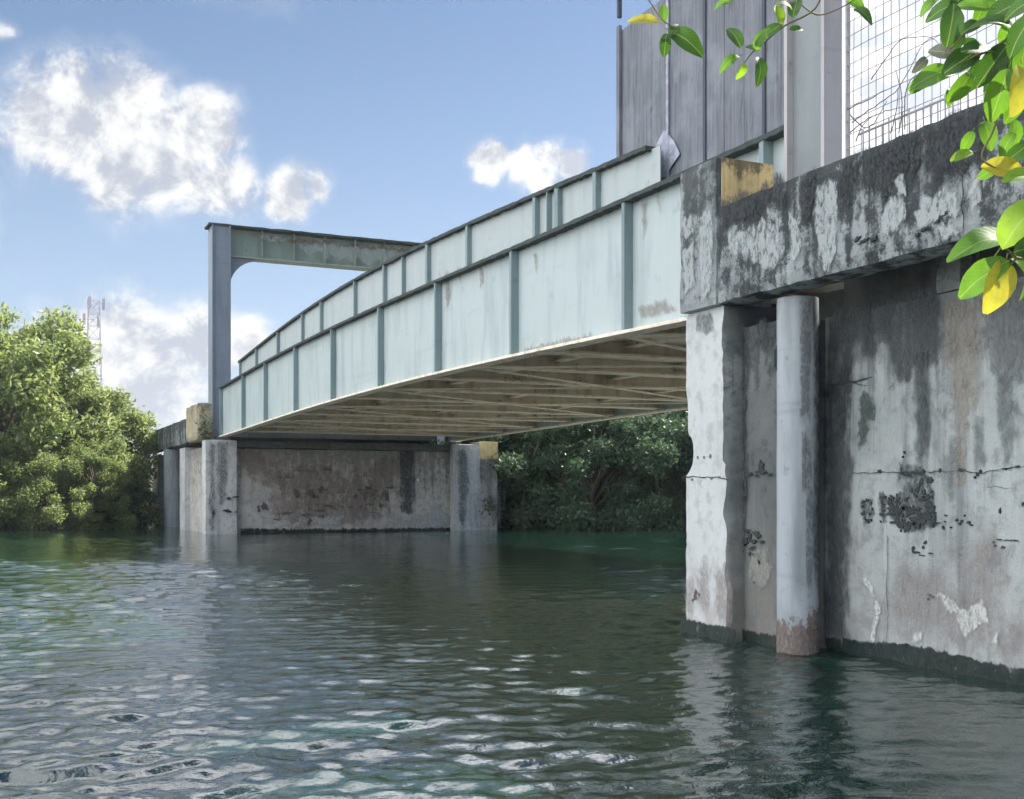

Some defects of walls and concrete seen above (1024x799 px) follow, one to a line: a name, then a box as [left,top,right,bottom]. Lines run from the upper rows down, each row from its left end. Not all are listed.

water stain [681,100,986,298]
water stain [982,282,1024,462]
water stain [209,442,228,530]
water stain [392,450,469,529]
spalling [742,529,765,565]
water stain [823,286,940,644]
peeling [860,451,973,556]
crack [850,460,1024,489]
corrosion [776,607,820,655]
efflorescence [937,593,988,637]